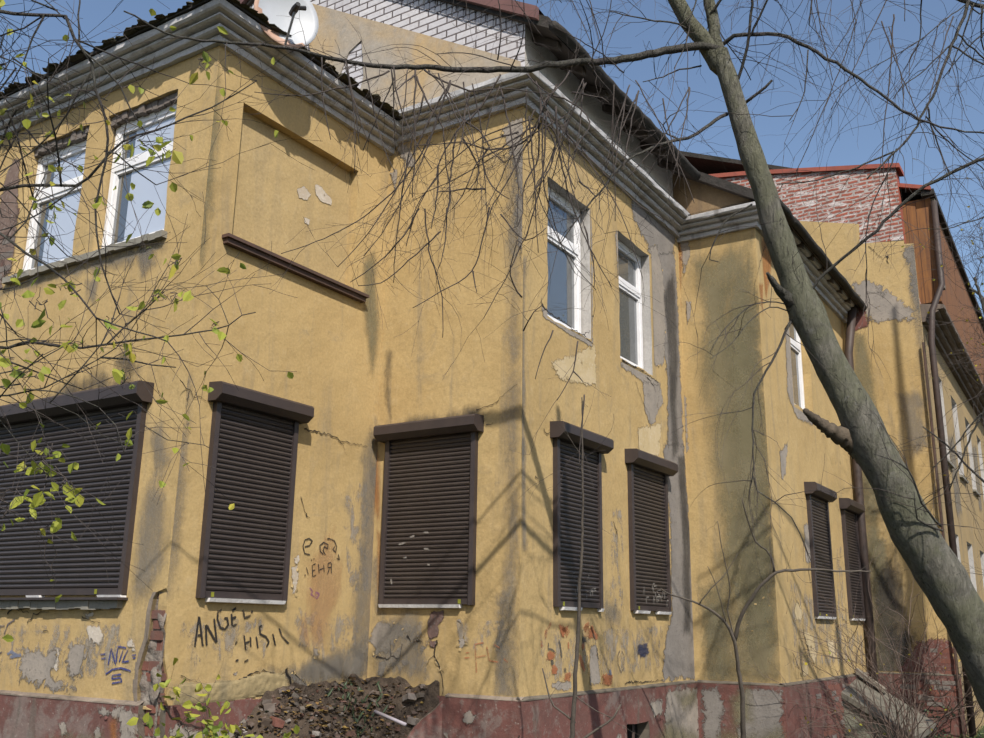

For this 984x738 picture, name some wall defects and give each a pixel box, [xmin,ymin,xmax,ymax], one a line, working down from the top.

peeling [297,184,332,205]
peeling [542,208,597,388]
peeling [852,280,920,331]
leakage [511,421,525,546]
leakage [665,278,690,631]
peeling [621,201,784,738]
leakage [696,249,777,682]
leakage [862,471,909,671]
spalling [19,592,250,738]
peeling [589,643,601,685]